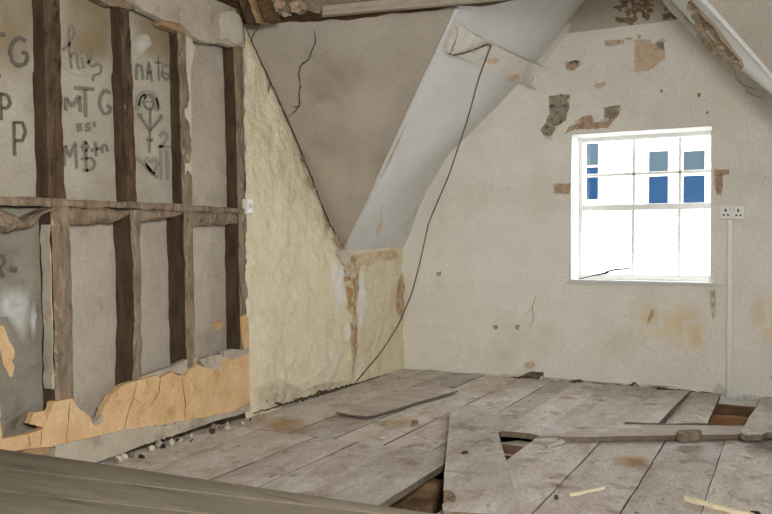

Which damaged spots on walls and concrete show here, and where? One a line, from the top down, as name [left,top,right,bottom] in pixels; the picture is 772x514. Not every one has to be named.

flaking render [90,0,244,136]
peeling [605,34,666,72]
peeling [613,0,676,25]
flaking render [686,0,744,71]
crack [246,27,343,247]
peeling [541,93,622,140]
peeling [552,183,571,195]
peeling [713,169,729,196]
flaking render [0,314,251,463]